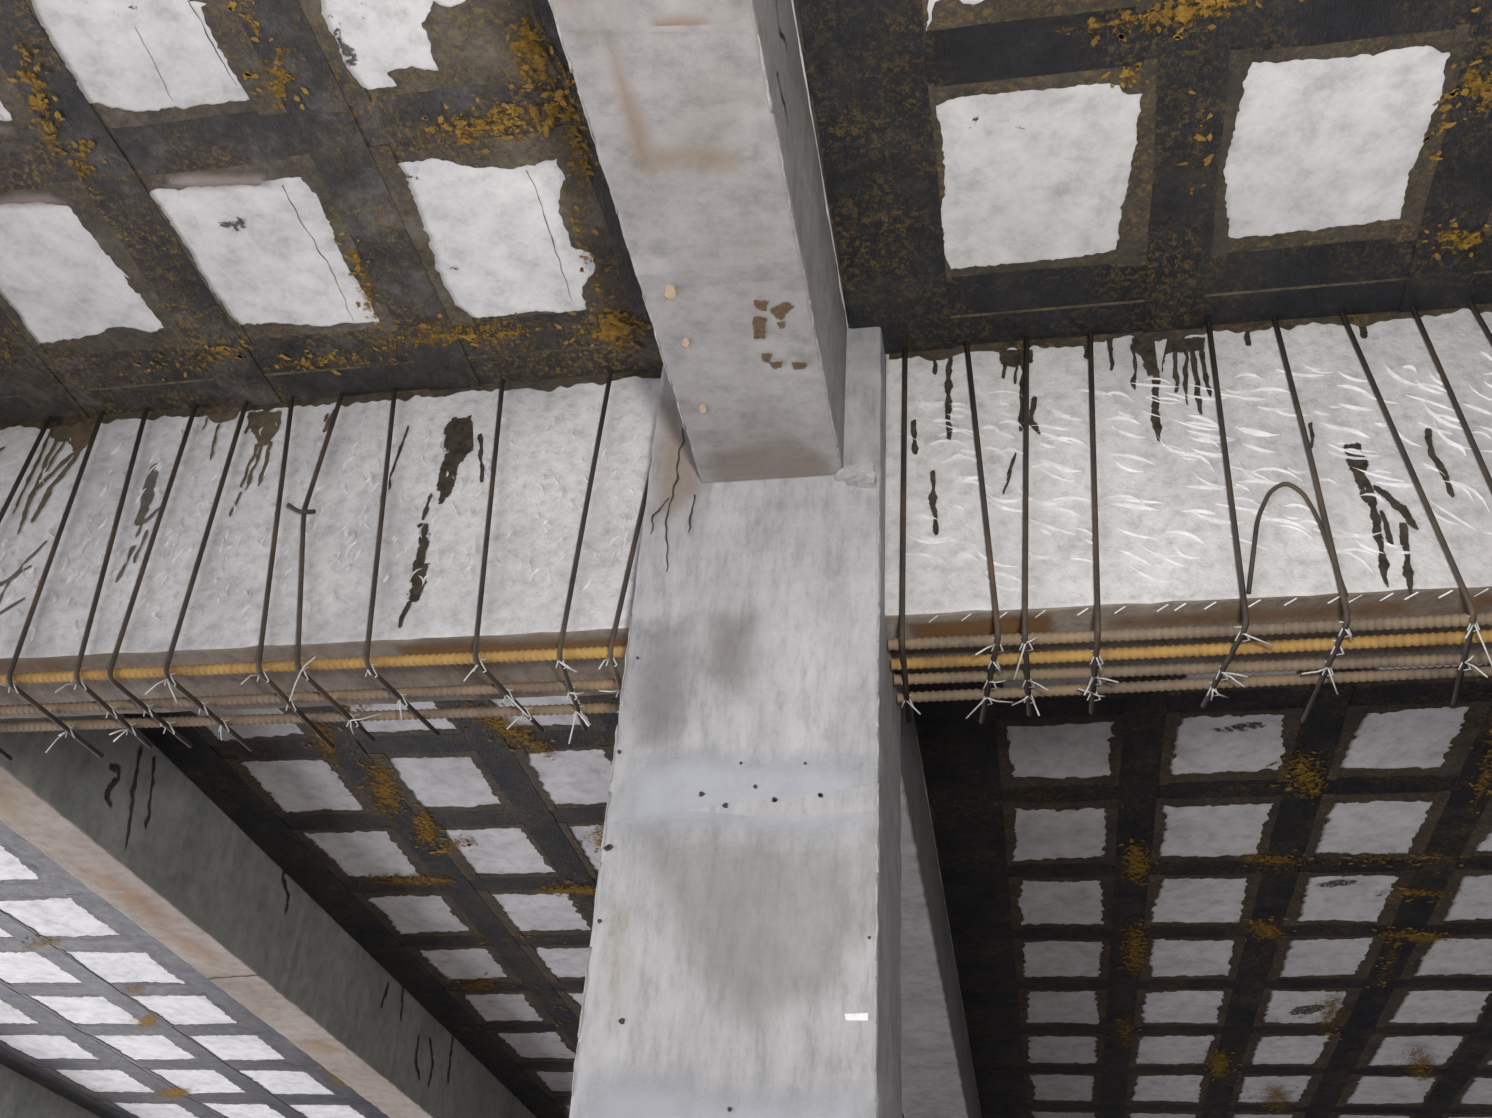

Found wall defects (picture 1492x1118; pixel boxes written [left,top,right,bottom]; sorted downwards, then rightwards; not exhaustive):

corrosion [7,42,107,190]
corrosion [228,1,309,116]
corrosion [1051,0,1262,47]
corrosion [1423,50,1492,160]
corrosion [263,13,653,375]
corrosion [1423,215,1492,260]
damp [889,304,1492,441]
damp [115,463,160,583]
damp [0,372,662,535]
damp [398,415,485,628]
damp [928,470,939,535]
damp [1424,428,1455,498]